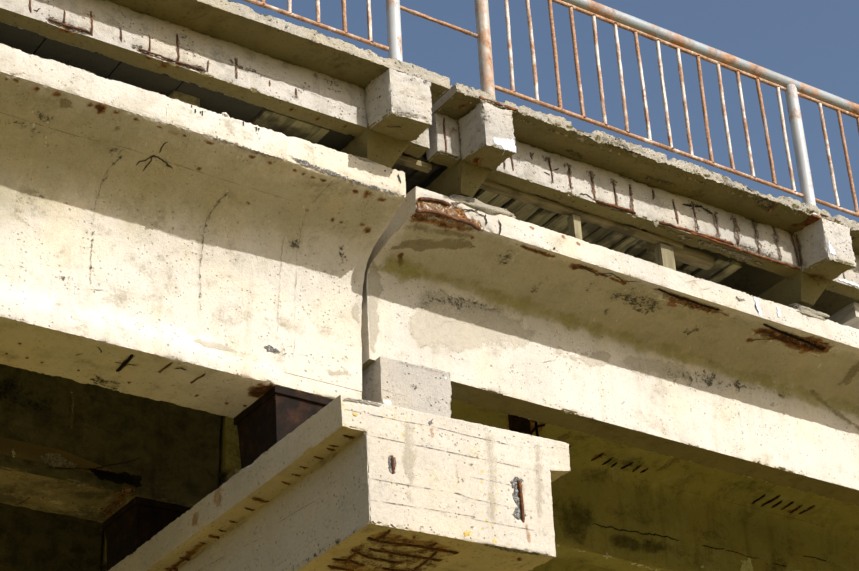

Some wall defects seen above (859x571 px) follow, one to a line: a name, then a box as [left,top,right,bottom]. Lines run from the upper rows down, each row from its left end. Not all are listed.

rust [87,103,118,114]
crack [95,142,172,205]
spalling [412,197,484,231]
rust [570,263,626,285]
rust [746,328,832,353]
spalling [39,452,142,488]
crack [591,523,679,541]
spalling [328,530,459,571]